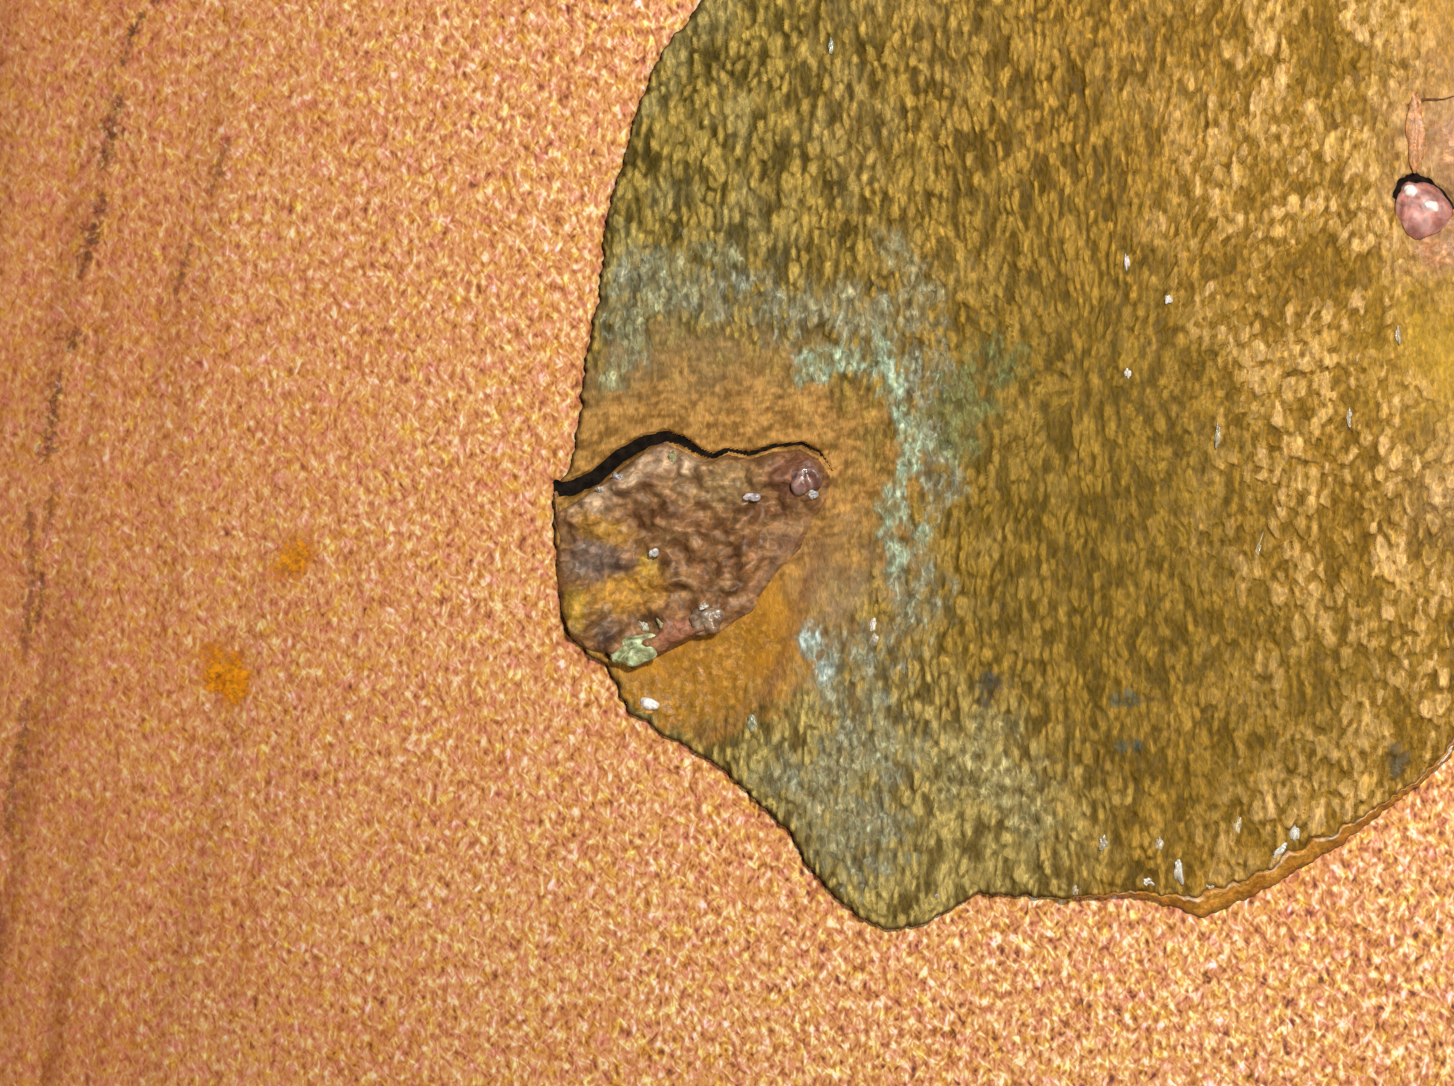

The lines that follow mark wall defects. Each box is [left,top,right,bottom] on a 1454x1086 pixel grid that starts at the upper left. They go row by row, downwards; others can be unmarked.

crack [553,431,833,498]